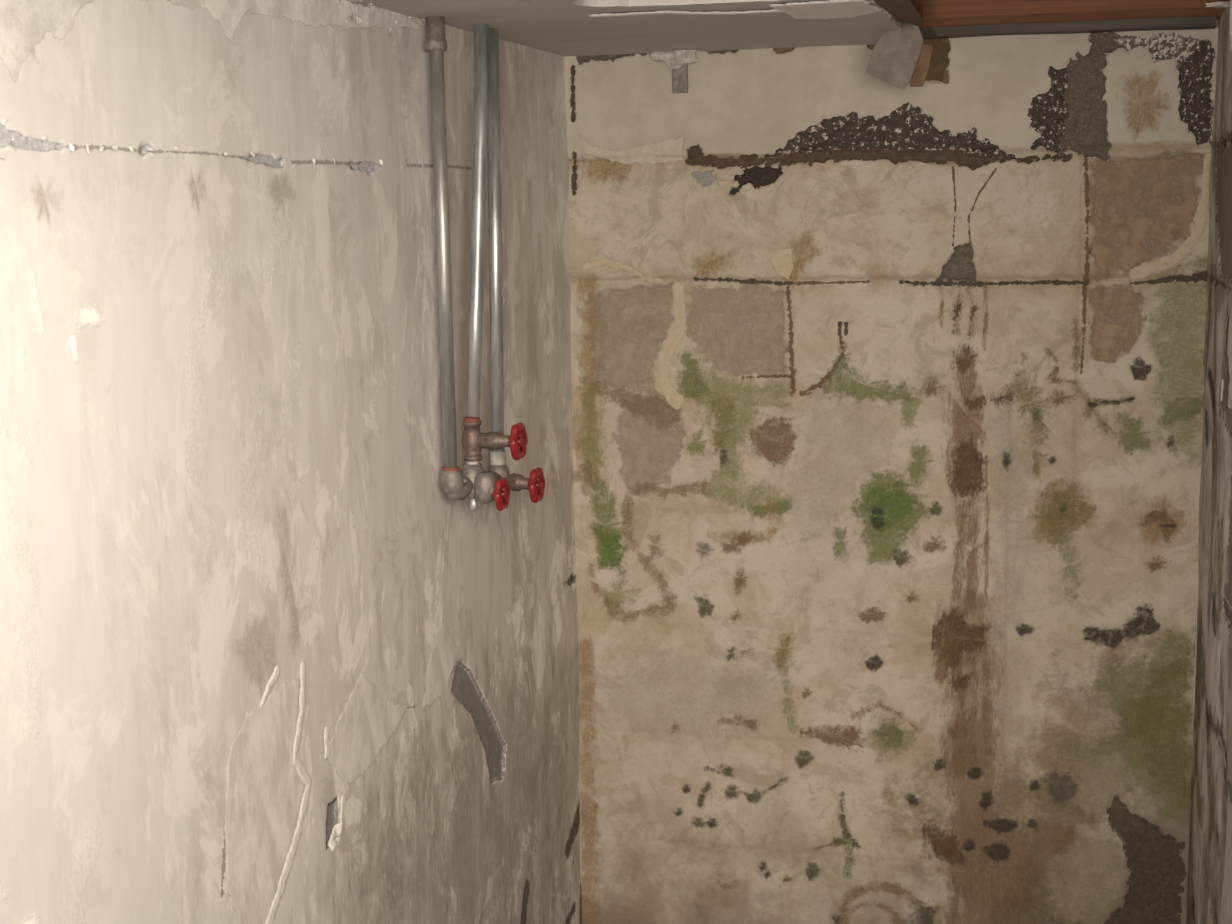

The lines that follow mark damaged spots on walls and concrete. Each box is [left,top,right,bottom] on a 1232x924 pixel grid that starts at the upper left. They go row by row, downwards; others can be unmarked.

peeling [768,0,882,19]